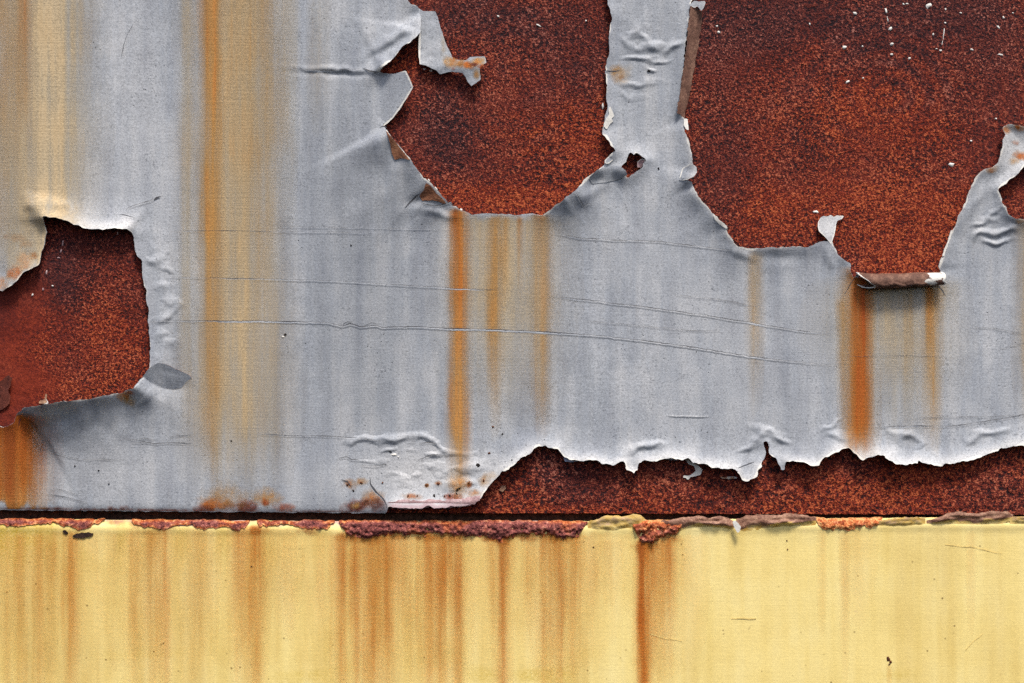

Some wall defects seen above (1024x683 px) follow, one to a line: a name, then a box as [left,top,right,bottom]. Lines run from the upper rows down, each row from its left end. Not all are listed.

peeling [0,216,192,434]
corrosion [199,0,273,450]
corrosion [407,210,548,499]
peeling [375,0,646,215]
peeling [677,0,1024,289]
corrosion [842,273,937,443]
corrosion [132,480,588,588]
peeling [386,441,1024,533]
corrosion [816,516,883,531]